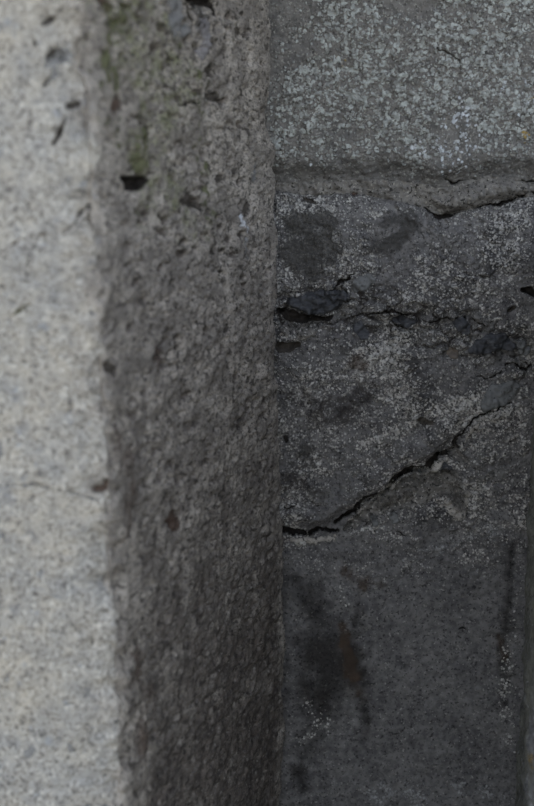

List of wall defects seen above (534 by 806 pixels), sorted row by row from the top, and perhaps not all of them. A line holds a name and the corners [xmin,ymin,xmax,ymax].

crack [416,205,456,220]
crack [474,180,534,209]
crack [323,273,485,328]
crack [476,361,531,380]
crack [282,401,512,537]
damp [296,634,362,746]